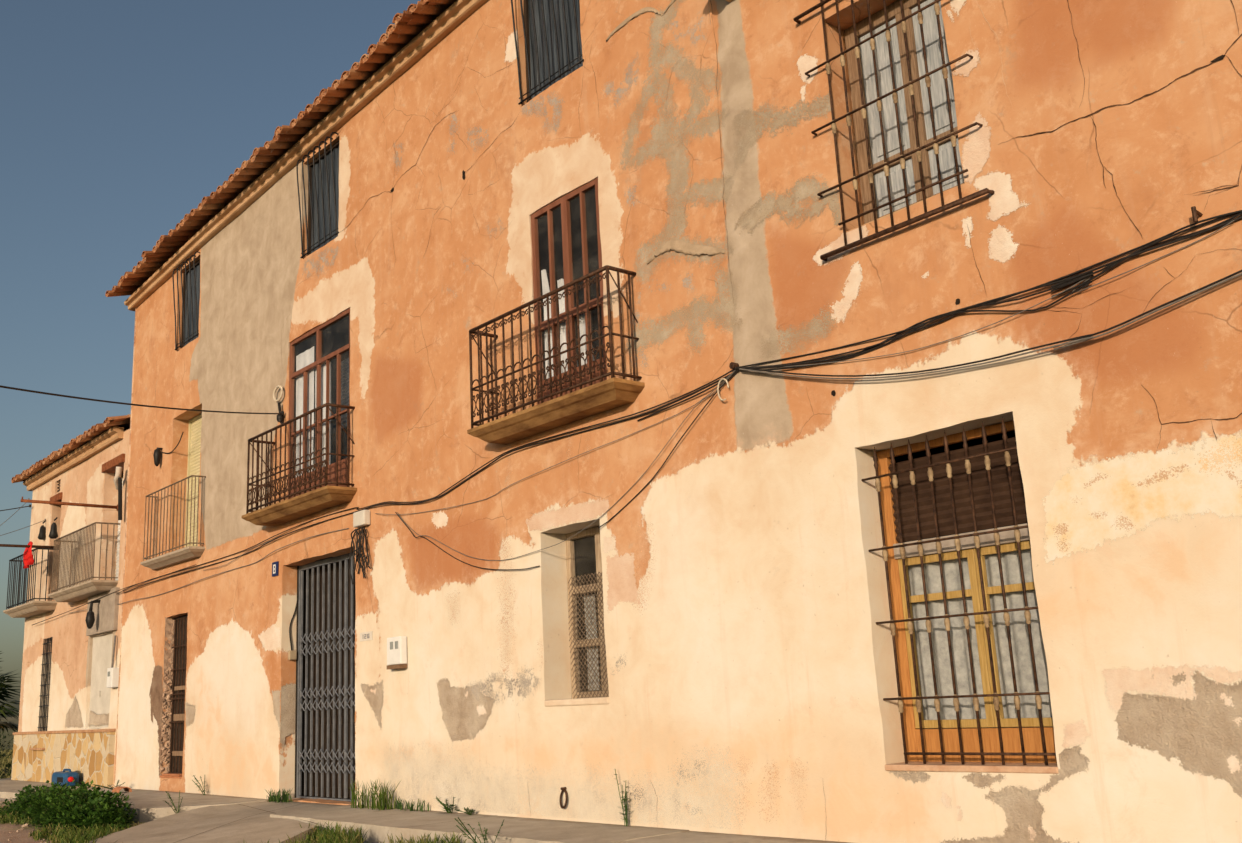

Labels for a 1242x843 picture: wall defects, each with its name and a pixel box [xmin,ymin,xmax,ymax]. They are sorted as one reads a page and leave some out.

peeling [796,54,818,102]
peeling [952,49,980,77]
crack [1000,0,1242,236]
peeling [961,111,1029,263]
crack [1148,392,1242,448]
peeling [1041,433,1242,563]
peeling [258,624,281,651]
peeling [149,665,163,777]
peeling [360,680,384,728]
peeling [437,677,495,742]
peeling [941,719,1091,843]
peeling [1101,664,1242,797]